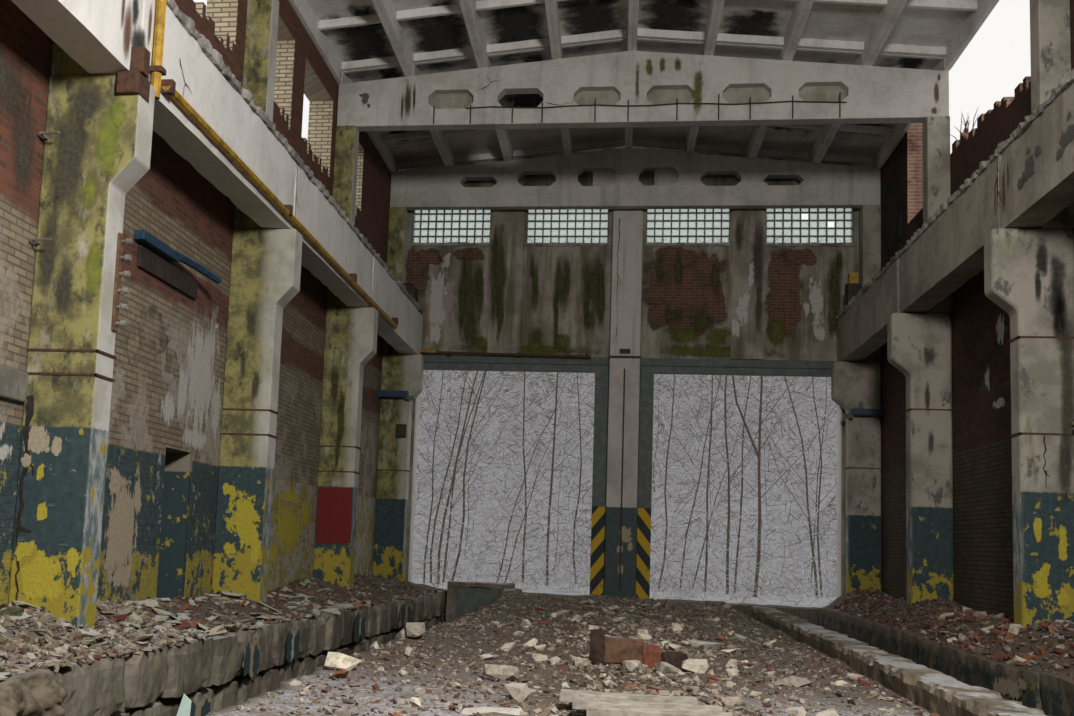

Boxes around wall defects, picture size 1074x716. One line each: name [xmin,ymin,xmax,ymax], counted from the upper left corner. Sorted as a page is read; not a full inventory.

water stain [41,84,97,308]
water stain [458,234,506,347]
water stain [554,261,570,349]
water stain [584,261,605,329]
water stain [753,232,763,330]
water stain [828,254,842,334]
peeling [126,304,221,451]
peeling [0,416,62,481]
peeling [15,534,79,603]
peeling [103,462,142,589]
peeling [223,480,310,565]
peeling [1030,517,1071,607]